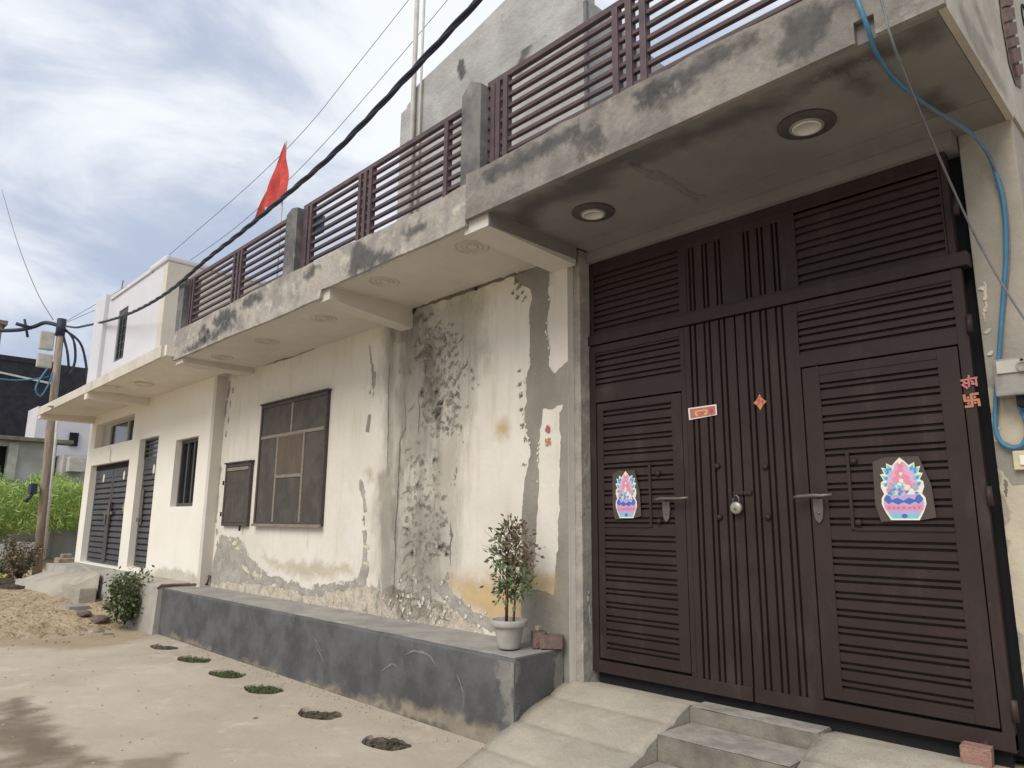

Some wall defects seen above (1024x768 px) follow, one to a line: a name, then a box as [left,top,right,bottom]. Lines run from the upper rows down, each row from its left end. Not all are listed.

damp [780,1,844,57]
damp [635,34,754,107]
damp [484,124,601,181]
damp [187,293,262,352]
damp [211,301,484,634]
flaking render [210,312,495,633]
peeling [511,266,570,683]